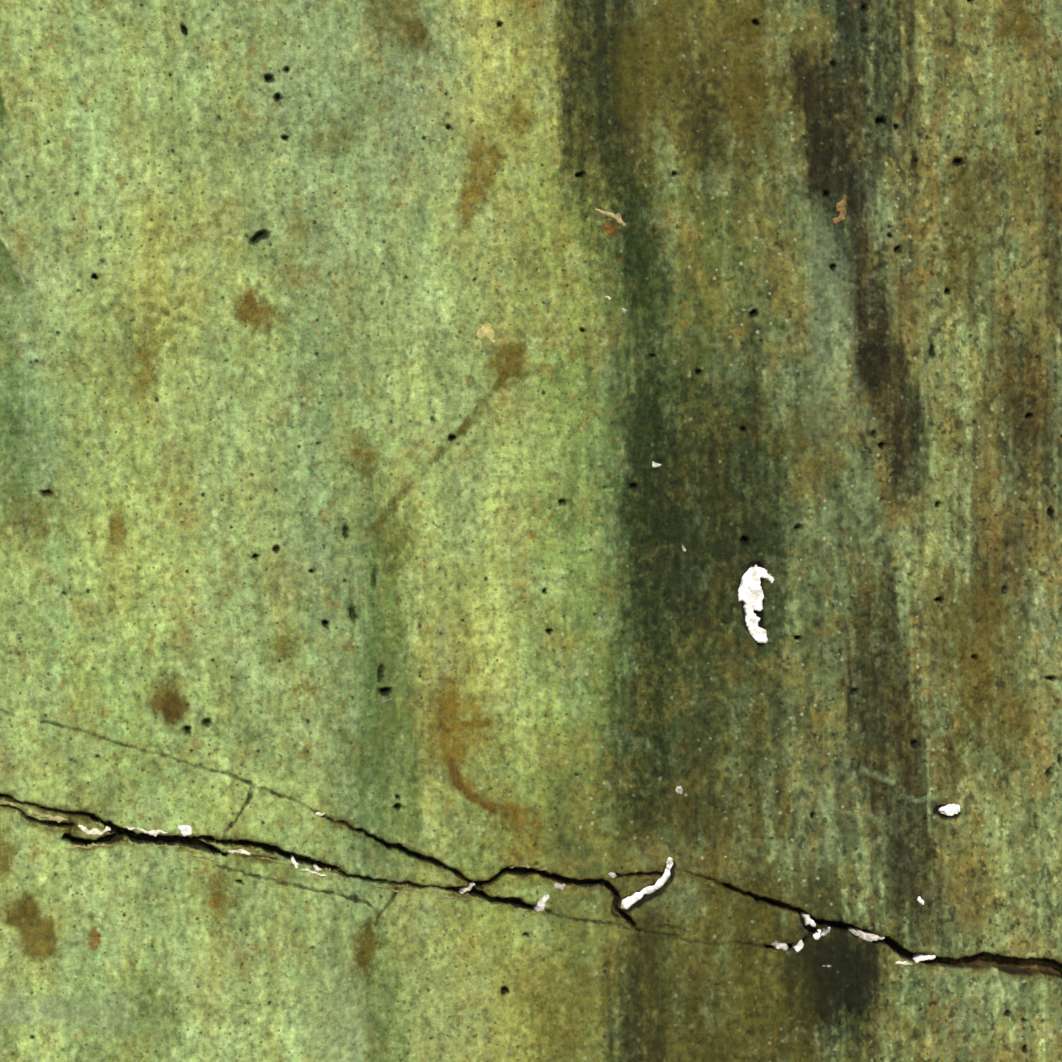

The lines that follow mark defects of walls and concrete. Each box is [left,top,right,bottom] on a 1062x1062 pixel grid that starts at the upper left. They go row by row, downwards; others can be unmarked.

rust [237,290,274,328]
rust [458,145,501,220]
water stain [559,0,786,684]
water stain [797,0,927,494]
rust [148,679,187,725]
rust [440,681,539,852]
water stain [848,589,960,929]
rust [4,894,56,957]
crack [0,770,1062,979]
water stain [526,883,887,1062]
water stain [912,953,936,963]